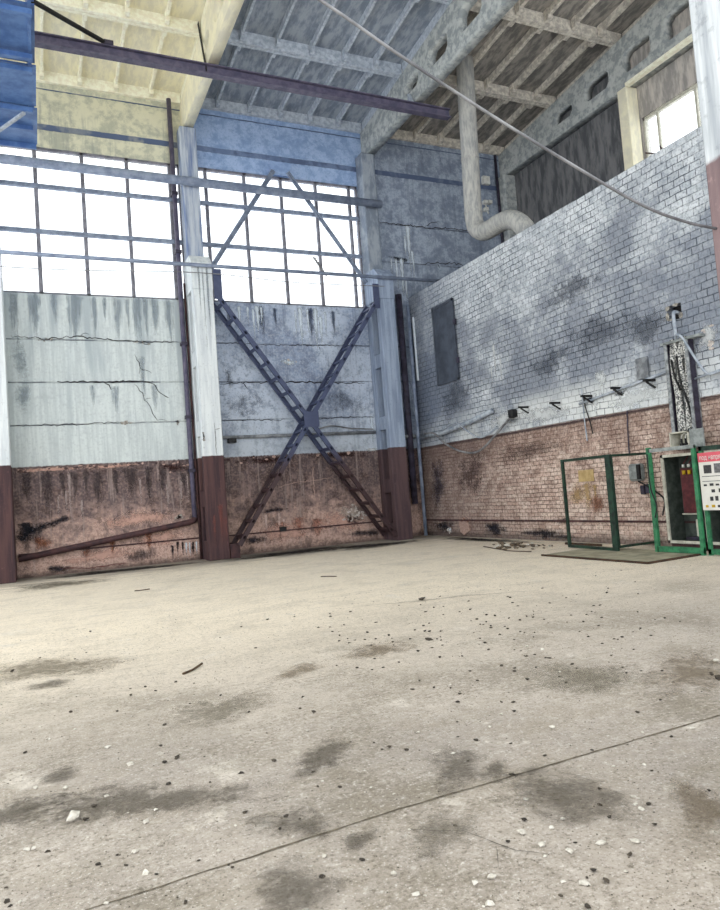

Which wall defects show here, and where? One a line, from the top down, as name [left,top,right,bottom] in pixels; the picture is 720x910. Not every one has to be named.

crack [382,222,468,231]
water stain [68,295,80,334]
water stain [92,298,171,332]
water stain [227,306,276,333]
water stain [294,308,335,345]
crack [15,333,177,420]
crack [16,420,120,428]
water stain [459,454,481,491]
water stain [18,471,102,548]